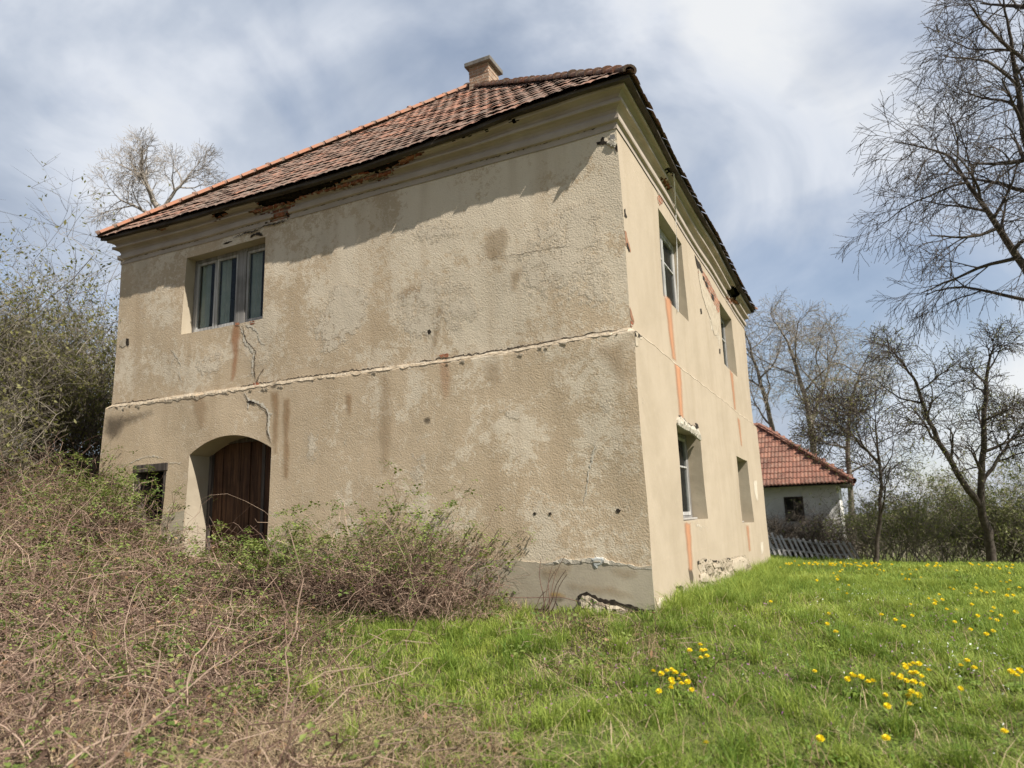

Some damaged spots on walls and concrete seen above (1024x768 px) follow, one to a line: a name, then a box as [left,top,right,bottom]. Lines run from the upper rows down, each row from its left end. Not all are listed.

crack [417,328,622,363]
crack [240,324,385,443]
peeling [698,556,748,582]